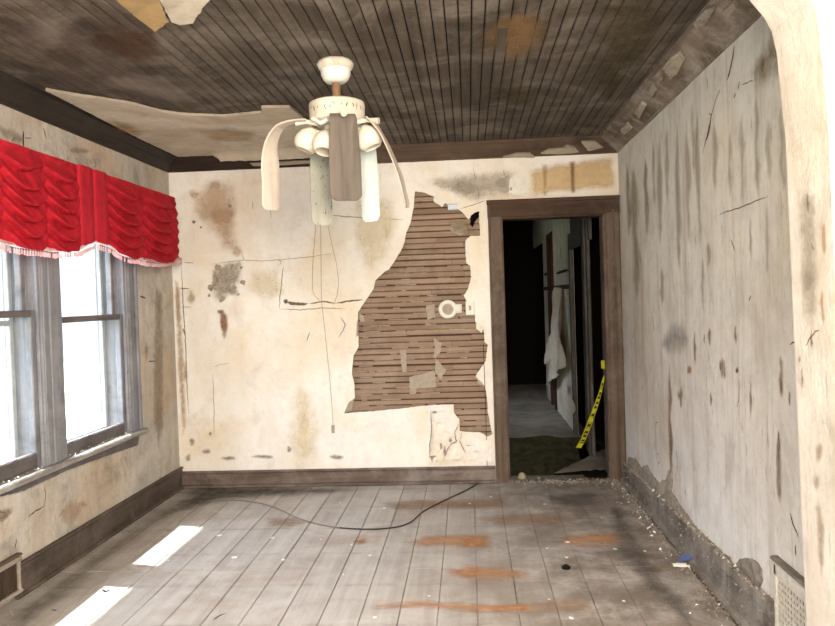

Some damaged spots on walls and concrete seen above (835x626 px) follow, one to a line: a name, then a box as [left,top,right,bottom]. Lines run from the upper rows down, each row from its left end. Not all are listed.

crack [703,46,754,150]
peeling [208,264,246,303]
spalling [279,192,492,436]
spalling [627,457,701,533]
spalling [721,551,763,587]